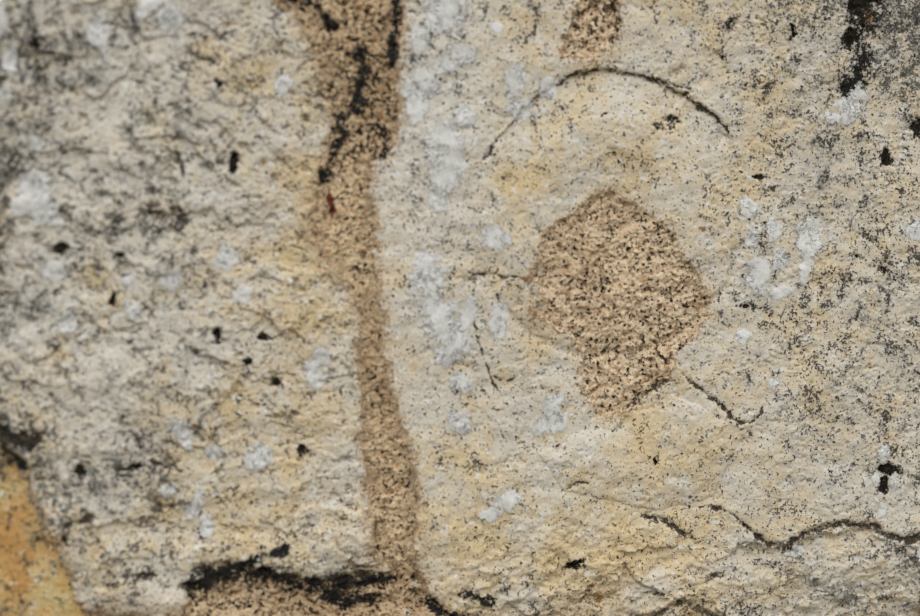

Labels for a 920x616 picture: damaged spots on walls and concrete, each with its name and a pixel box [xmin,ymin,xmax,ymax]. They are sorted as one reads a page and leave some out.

spalling [560,0,623,62]
crack [531,68,730,138]
crack [482,121,514,160]
spalling [528,191,711,419]
crack [641,514,697,540]
crack [698,505,920,567]